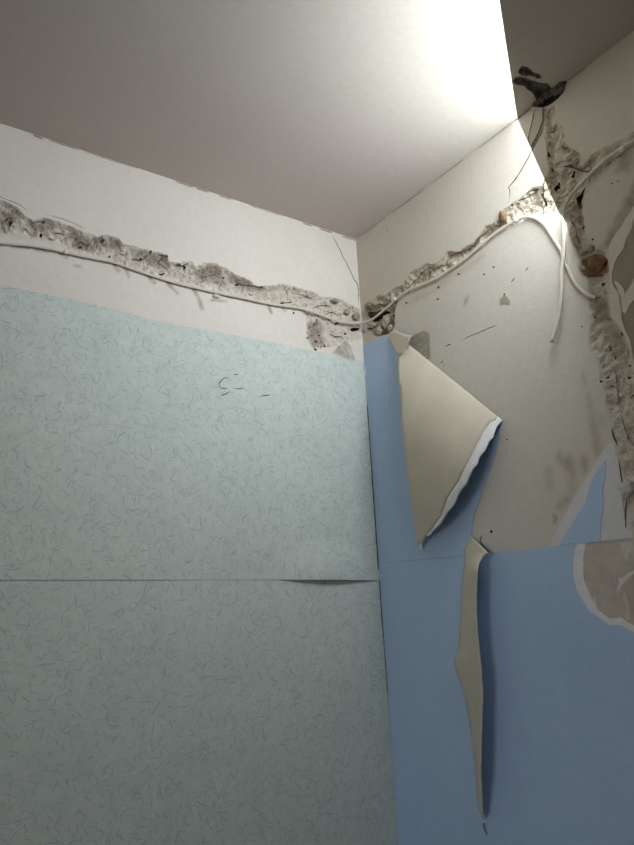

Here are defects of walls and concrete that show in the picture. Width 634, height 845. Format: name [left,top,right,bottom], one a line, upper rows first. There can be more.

flaking render [0,66,634,527]